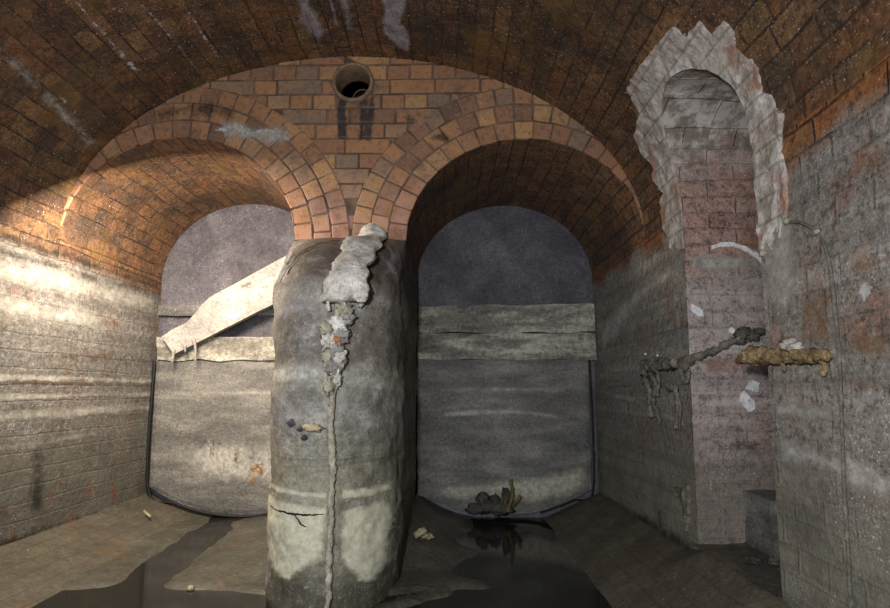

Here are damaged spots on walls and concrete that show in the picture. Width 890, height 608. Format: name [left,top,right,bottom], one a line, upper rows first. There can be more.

efflorescence [383,0,409,49]
efflorescence [215,121,290,144]
peeling [626,21,793,297]
water stain [0,373,151,422]